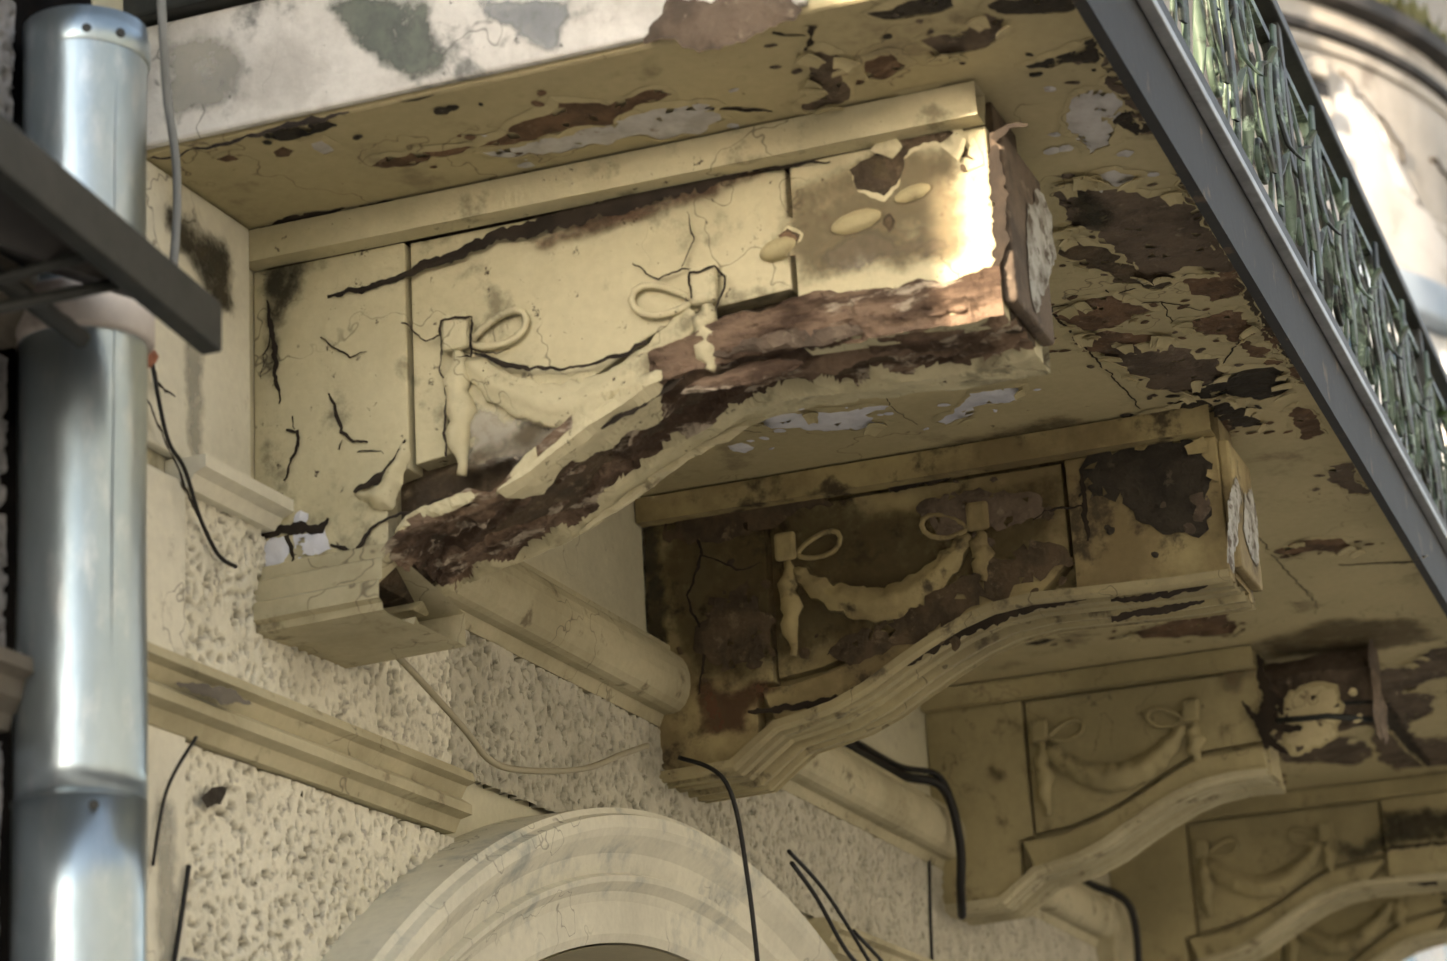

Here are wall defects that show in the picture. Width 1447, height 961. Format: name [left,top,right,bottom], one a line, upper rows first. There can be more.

spalling [643,0,803,52]
spalling [770,0,1077,115]
crack [327,160,830,312]
damp [787,154,959,272]
crack [260,300,300,481]
crack [261,393,493,561]
crack [401,316,647,458]
crack [570,375,684,453]
spalling [360,36,1329,594]
spalling [827,477,1075,666]
spalling [1078,436,1385,574]
spalling [1270,642,1447,786]